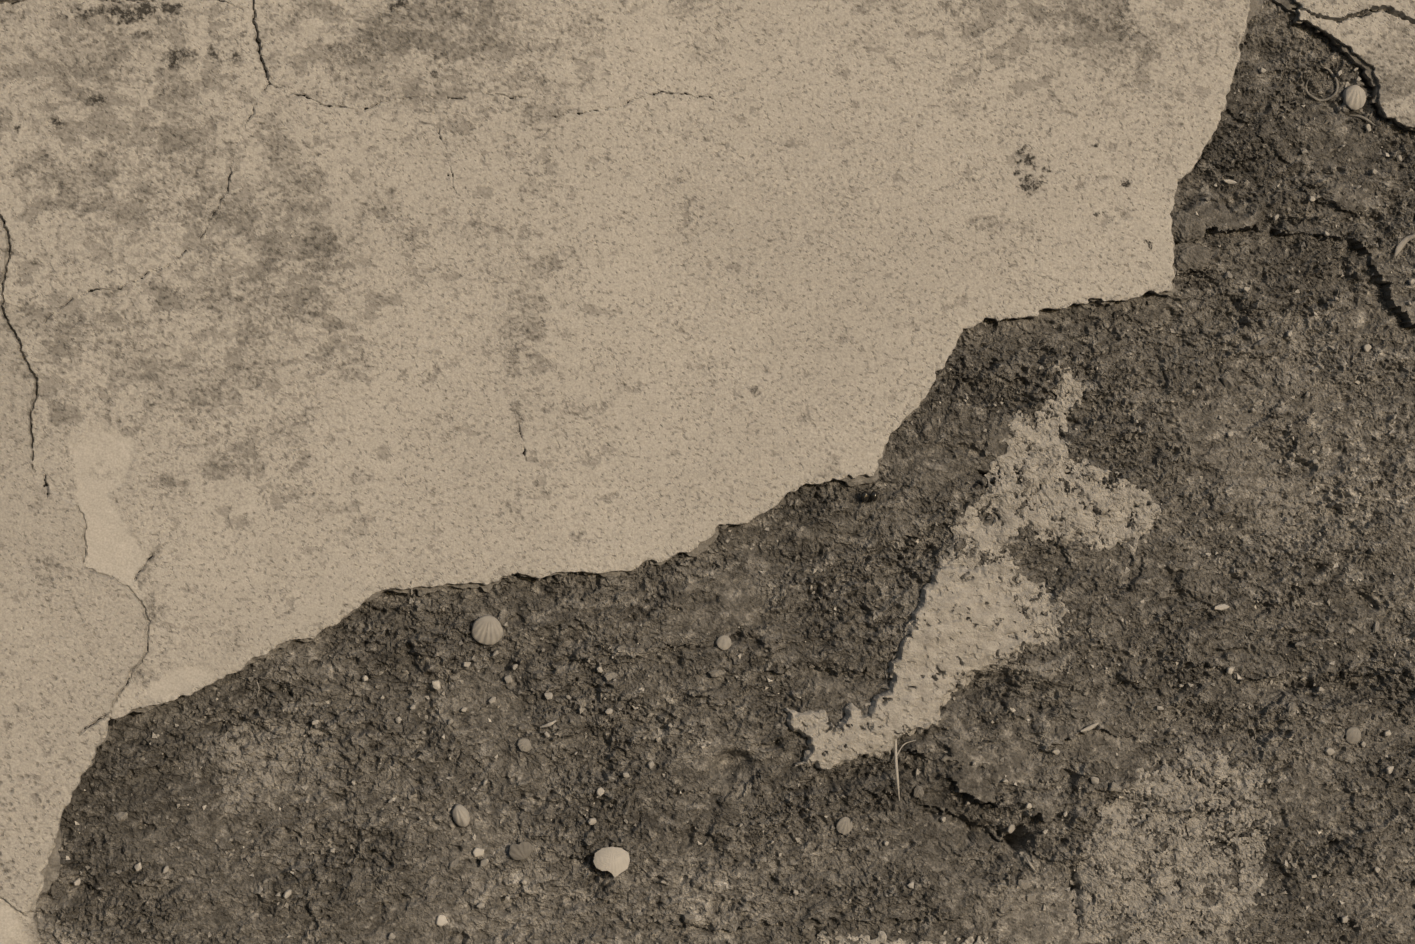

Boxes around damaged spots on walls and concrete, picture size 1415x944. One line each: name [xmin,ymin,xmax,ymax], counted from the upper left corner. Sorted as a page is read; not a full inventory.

crack [218,0,377,118]
peeling [1256,474,1358,559]
crack [80,717,114,733]
peeling [214,718,337,820]
peeling [436,915,448,927]
spalling [1106,902,1133,944]